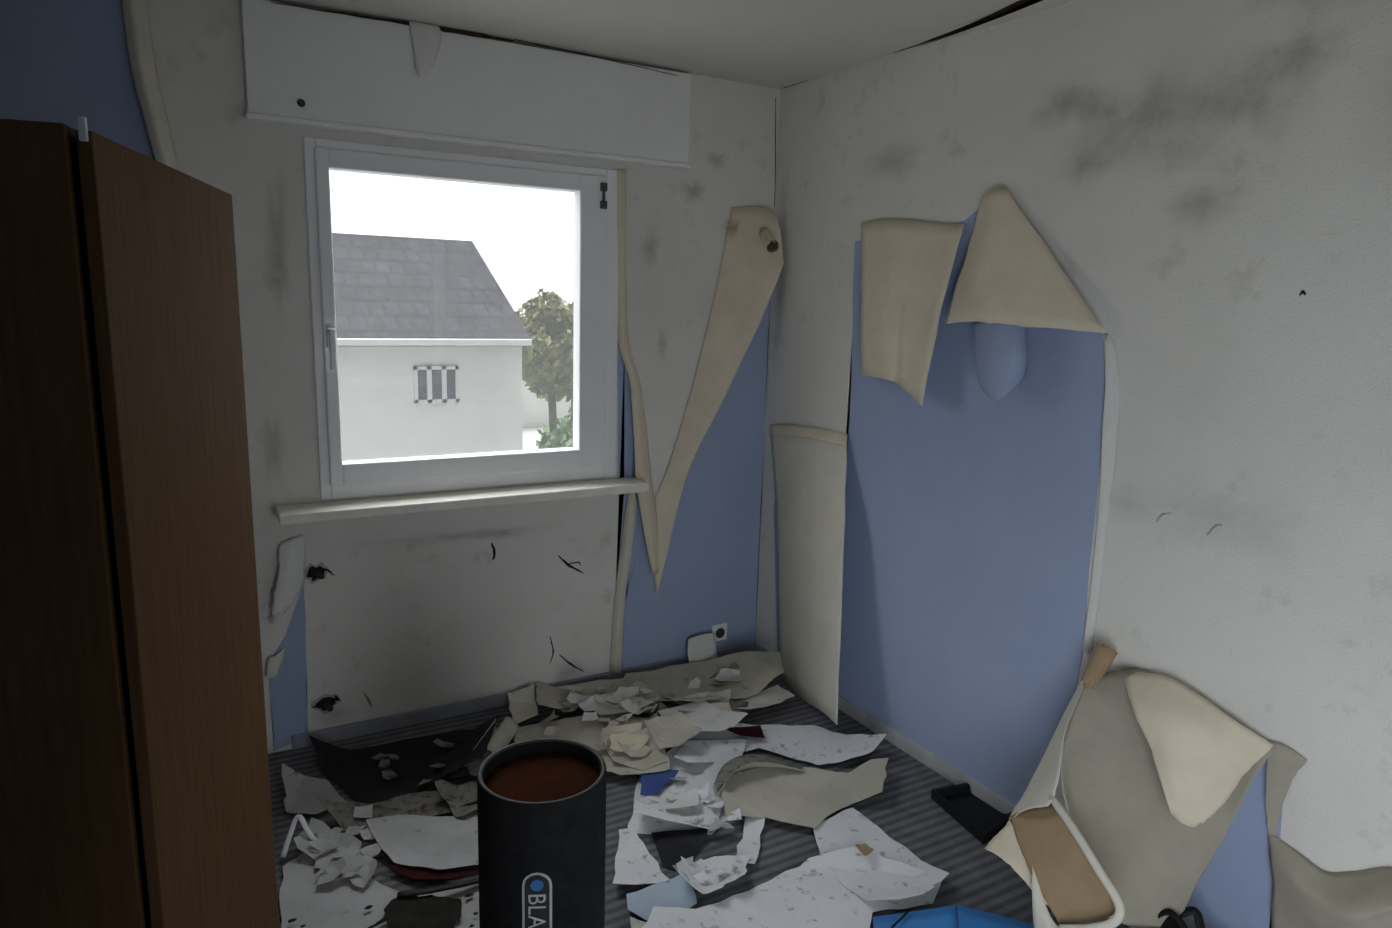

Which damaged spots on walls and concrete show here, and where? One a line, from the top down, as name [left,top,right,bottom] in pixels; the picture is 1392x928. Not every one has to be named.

peeling [0,0,155,160]
crack [895,0,1072,53]
peeling [616,298,779,669]
peeling [838,210,1105,805]
peeling [1186,761,1283,928]